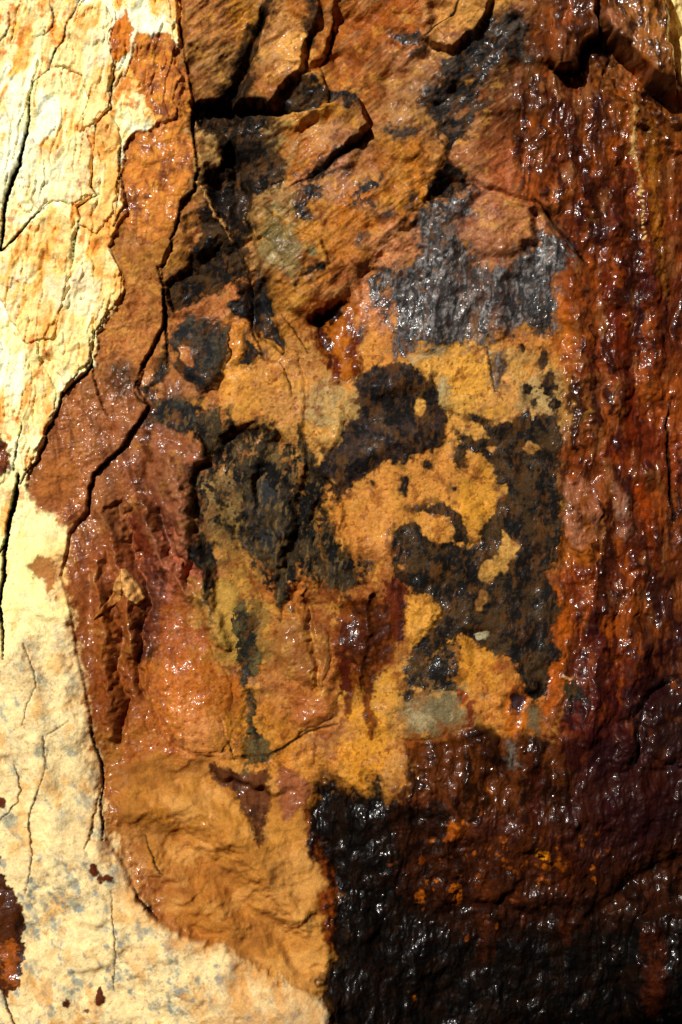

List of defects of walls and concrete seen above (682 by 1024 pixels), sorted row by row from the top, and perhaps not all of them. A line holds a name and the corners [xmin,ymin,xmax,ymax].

crack [0,0,80,252]
crack [73,61,121,257]
crack [88,24,200,512]
leakage [105,0,575,732]
corrosion [560,102,663,571]
corrosion [644,117,669,292]
corrosion [596,499,615,618]
crack [86,728,105,844]
crack [134,888,155,916]